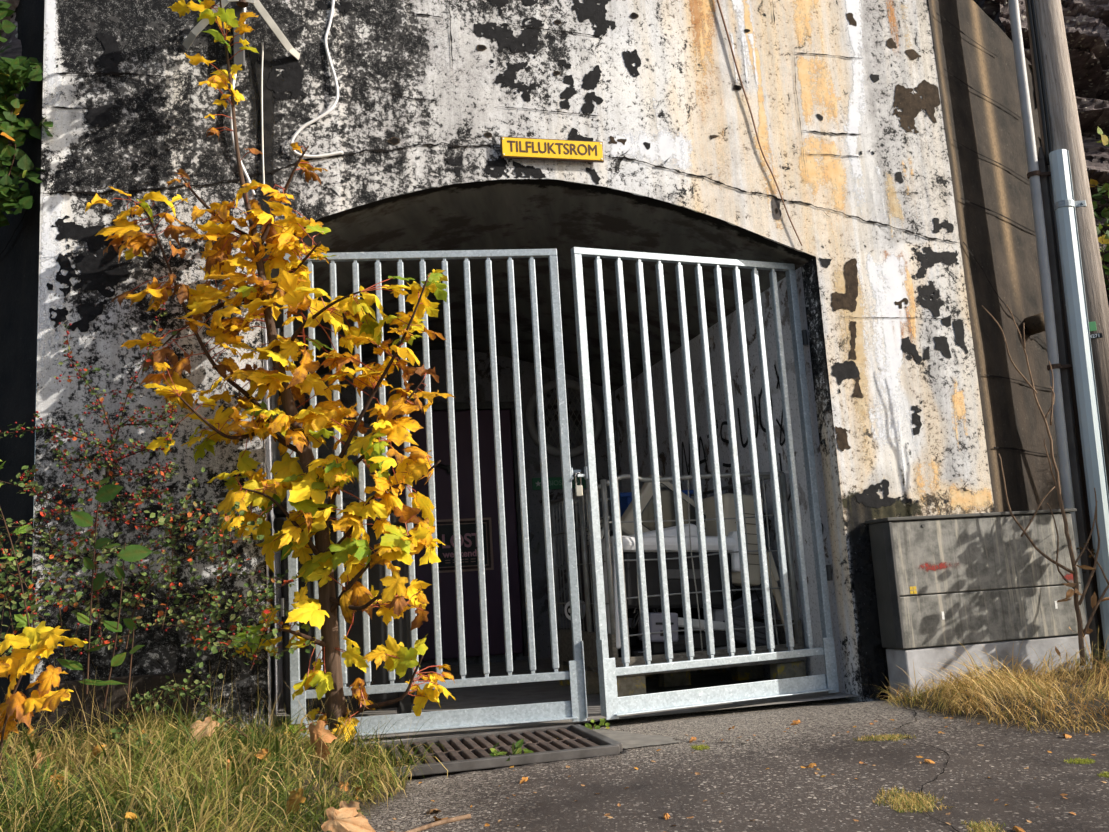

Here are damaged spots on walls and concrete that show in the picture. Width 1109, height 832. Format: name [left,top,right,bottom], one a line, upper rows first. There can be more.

water stain [44,0,60,106]
water stain [246,48,275,233]
peeling [474,0,544,101]
peeling [556,59,603,114]
peeling [570,0,615,38]
peeling [622,49,641,77]
rust [689,0,716,100]
peeling [893,80,940,133]
crack [604,150,1047,347]
peeling [831,258,863,398]
peeling [895,245,968,364]
peeling [912,405,922,435]